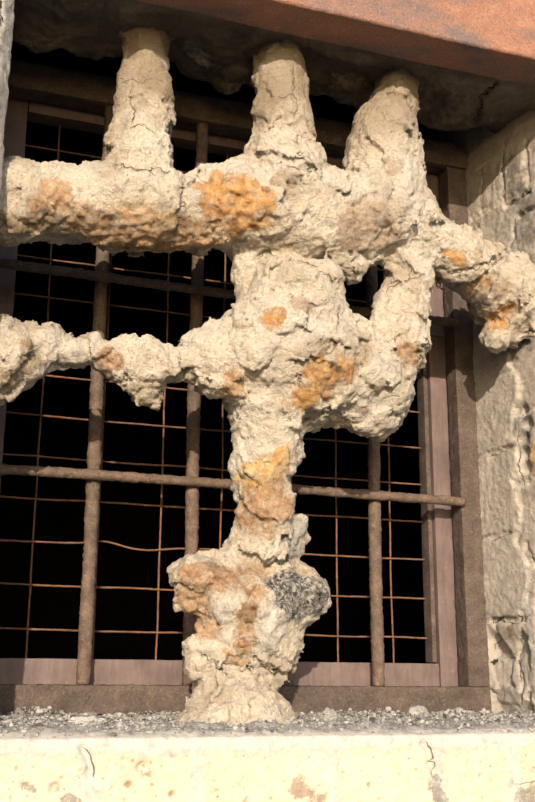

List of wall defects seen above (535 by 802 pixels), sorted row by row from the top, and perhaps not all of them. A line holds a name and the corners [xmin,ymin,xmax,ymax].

crack [122,78,160,134]
crack [271,65,298,115]
corrosion [27,177,73,224]
corrosion [195,170,296,242]
corrosion [261,297,310,332]
corrosion [216,366,246,400]
corrosion [290,345,371,410]
corrosion [393,343,420,366]
corrosion [232,442,291,493]
corrosion [175,560,271,666]
crack [493,604,535,650]
crack [425,741,449,802]